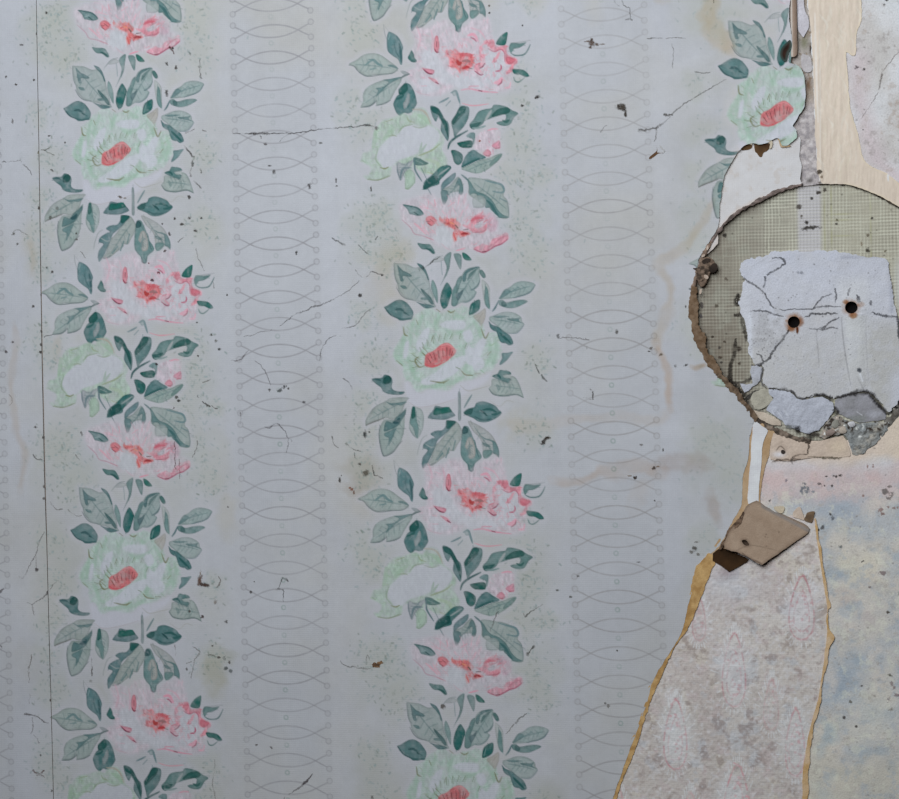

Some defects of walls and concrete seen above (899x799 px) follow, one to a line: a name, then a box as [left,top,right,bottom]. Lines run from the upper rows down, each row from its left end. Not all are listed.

flaking render [789,0,826,200]
crack [727,257,899,415]